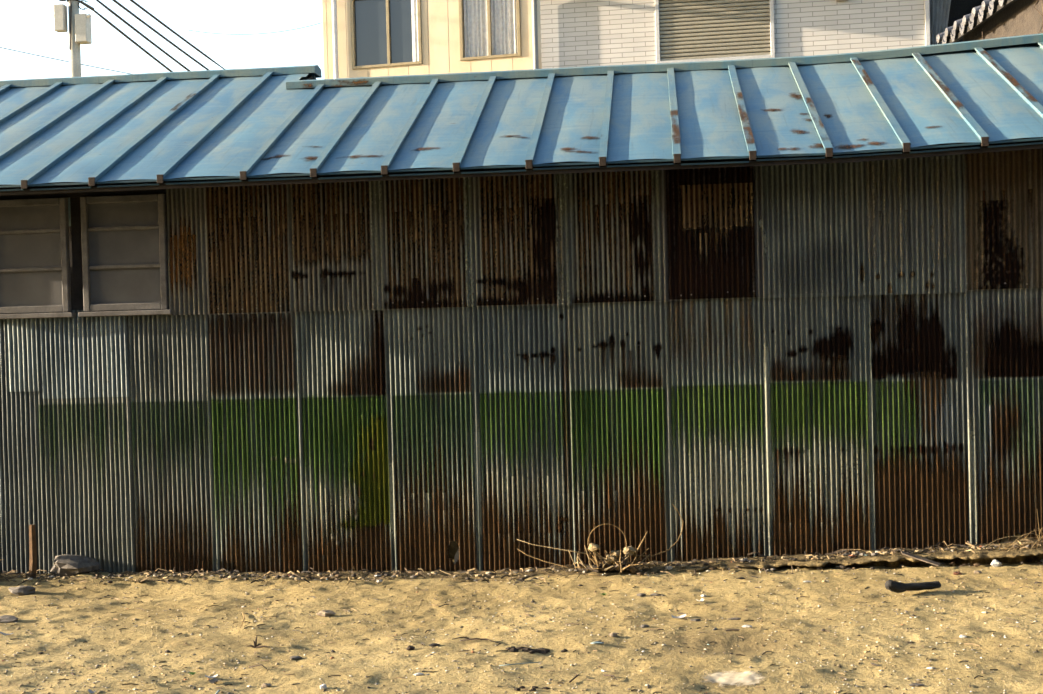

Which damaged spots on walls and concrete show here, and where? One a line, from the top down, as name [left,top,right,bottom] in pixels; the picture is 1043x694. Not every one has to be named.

rust [135,148,1043,573]